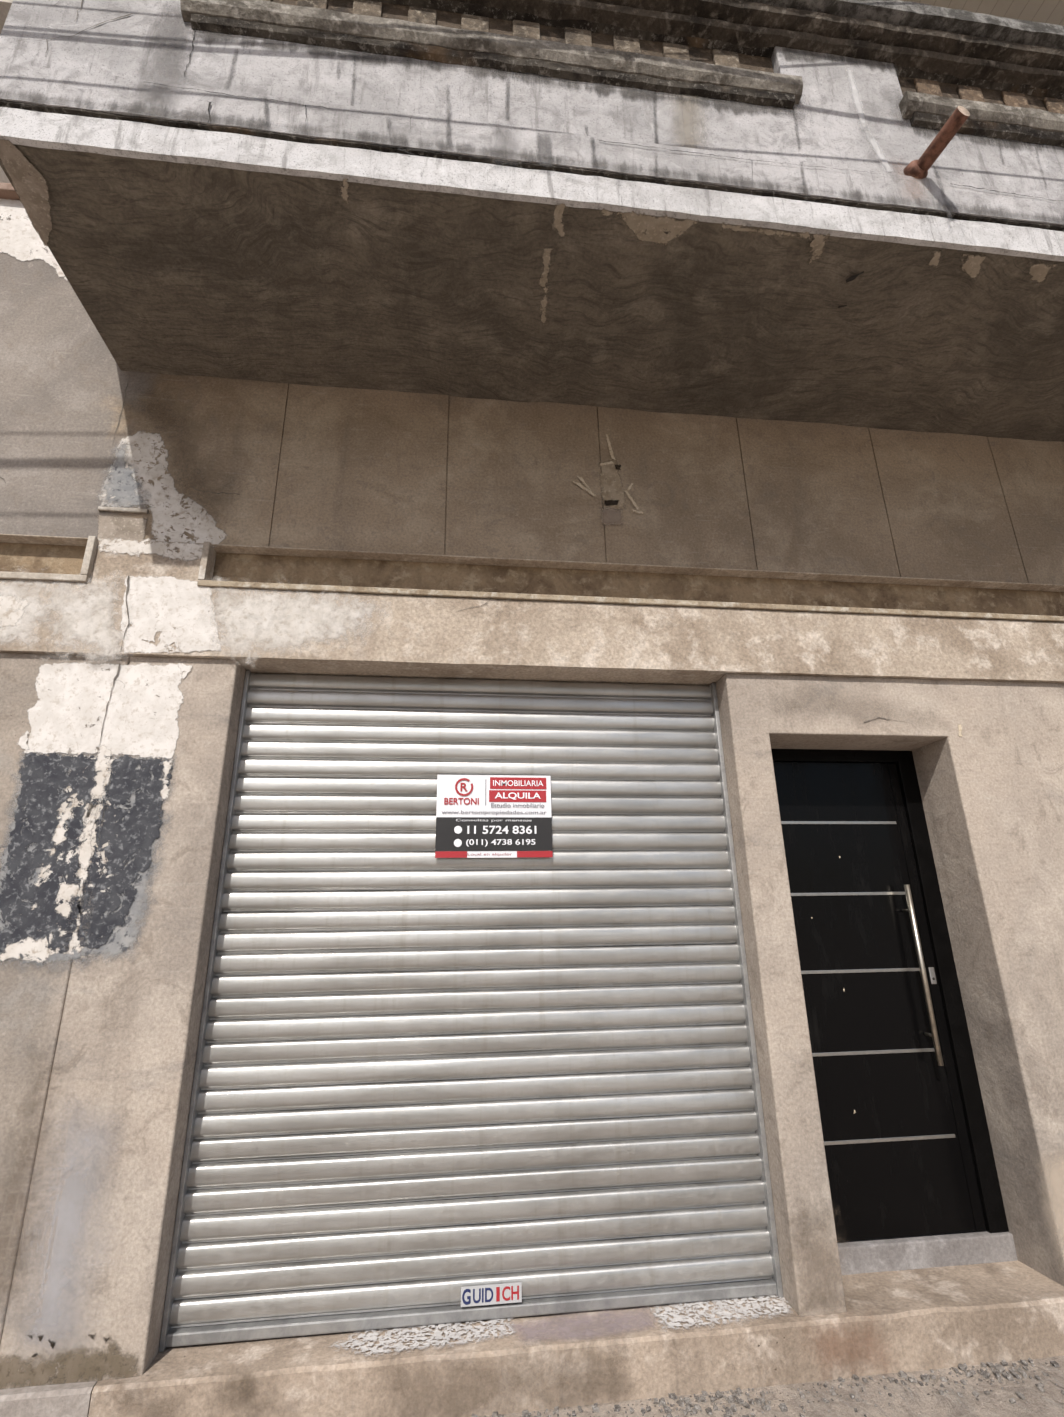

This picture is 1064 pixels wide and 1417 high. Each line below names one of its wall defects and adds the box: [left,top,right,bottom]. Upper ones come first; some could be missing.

spalling [0,139,67,281]
spalling [1028,262,1056,283]
peeling [97,430,227,561]
peeling [0,575,373,966]